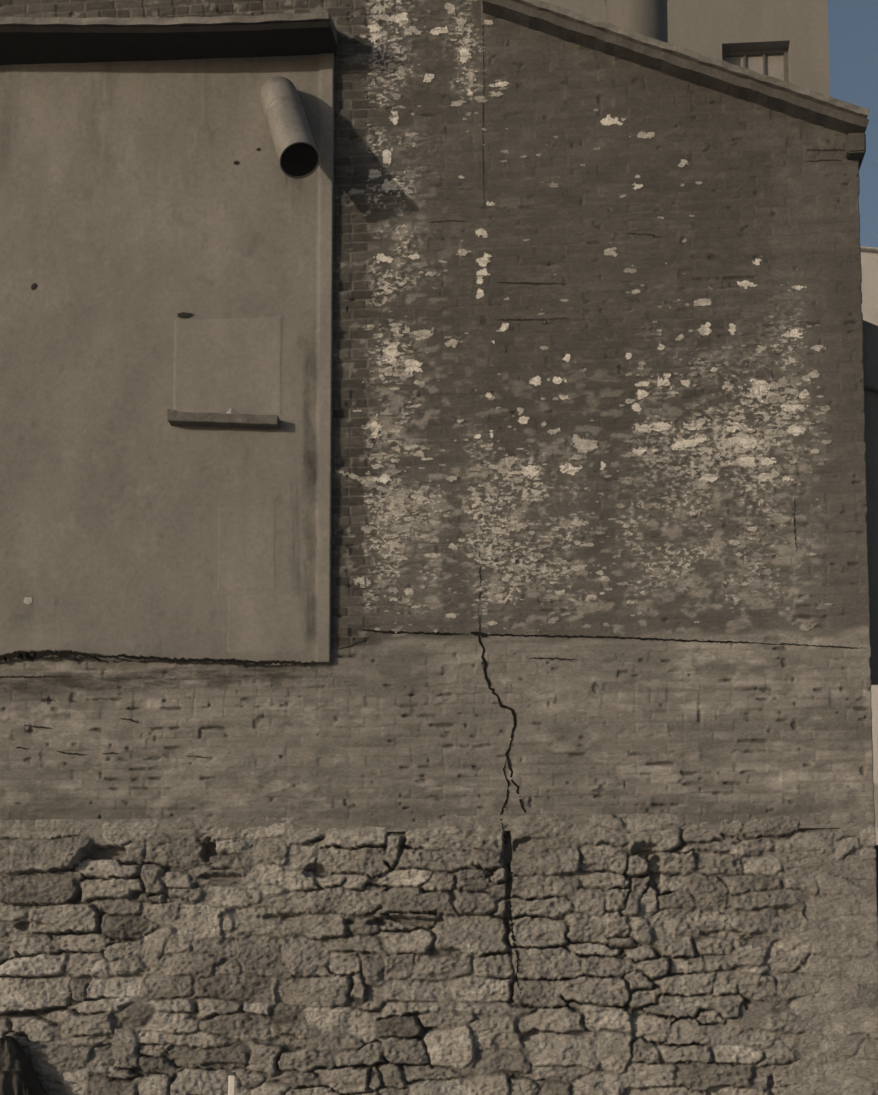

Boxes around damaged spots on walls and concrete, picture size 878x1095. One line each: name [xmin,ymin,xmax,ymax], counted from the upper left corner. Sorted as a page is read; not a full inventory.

crack [0,514,855,994]
peeling [349,0,832,634]
crack [791,500,799,553]